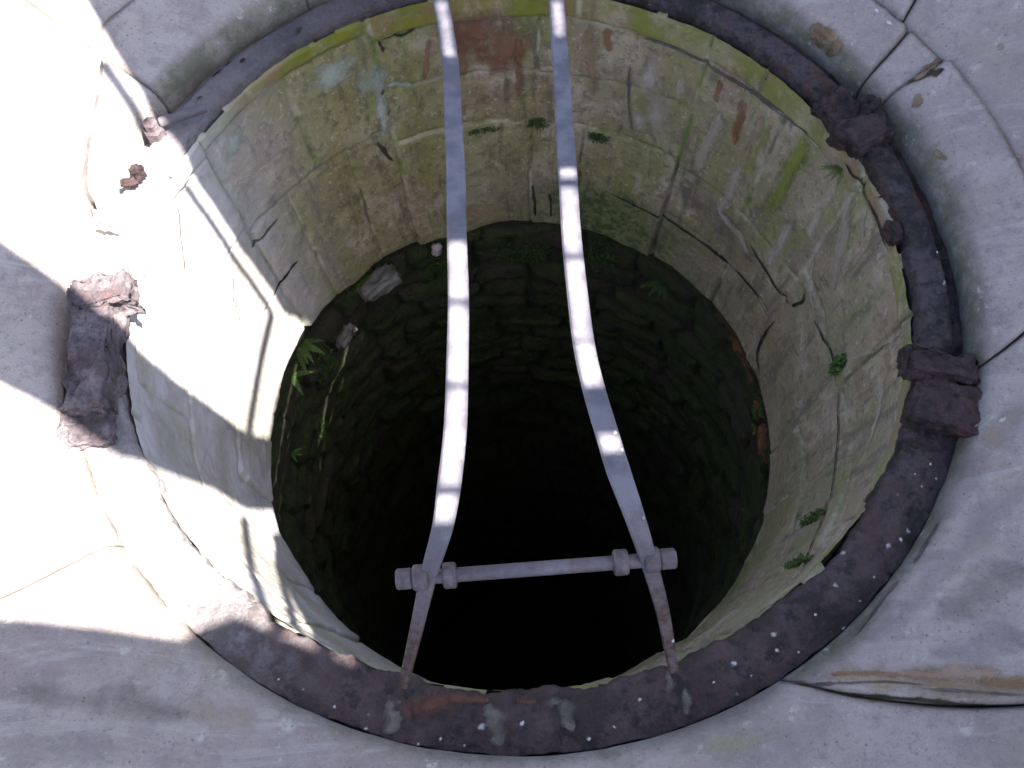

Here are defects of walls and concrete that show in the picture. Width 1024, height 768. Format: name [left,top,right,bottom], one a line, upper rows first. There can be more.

rust [454,19,530,96]
rust [733,101,745,143]
crack [531,185,552,216]
crack [610,193,833,370]